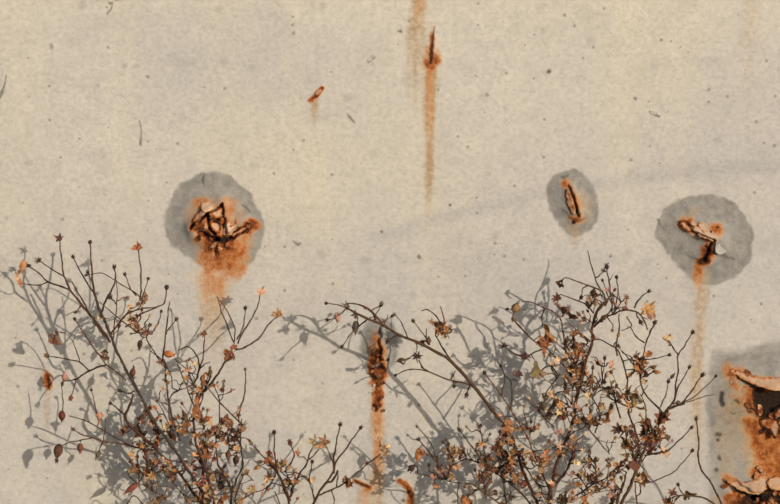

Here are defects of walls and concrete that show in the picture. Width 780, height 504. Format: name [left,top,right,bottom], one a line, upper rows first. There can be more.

corrosion [305,84,327,128]
corrosion [402,0,445,230]
corrosion [351,477,378,504]